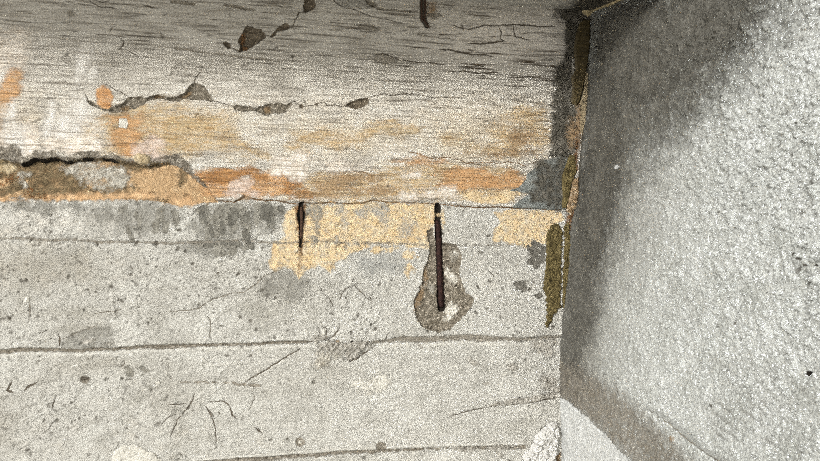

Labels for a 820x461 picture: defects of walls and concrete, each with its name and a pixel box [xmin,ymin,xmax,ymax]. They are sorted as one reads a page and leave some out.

leakage [0,29,102,156]
leakage [131,136,164,165]
crack [84,0,432,128]
leakage [270,150,308,182]
leakage [327,158,353,171]
rust [195,107,581,278]
leakage [400,187,457,201]
crack [372,24,558,78]
leakage [549,0,776,399]
spalling [414,203,474,333]
crack [162,283,372,441]